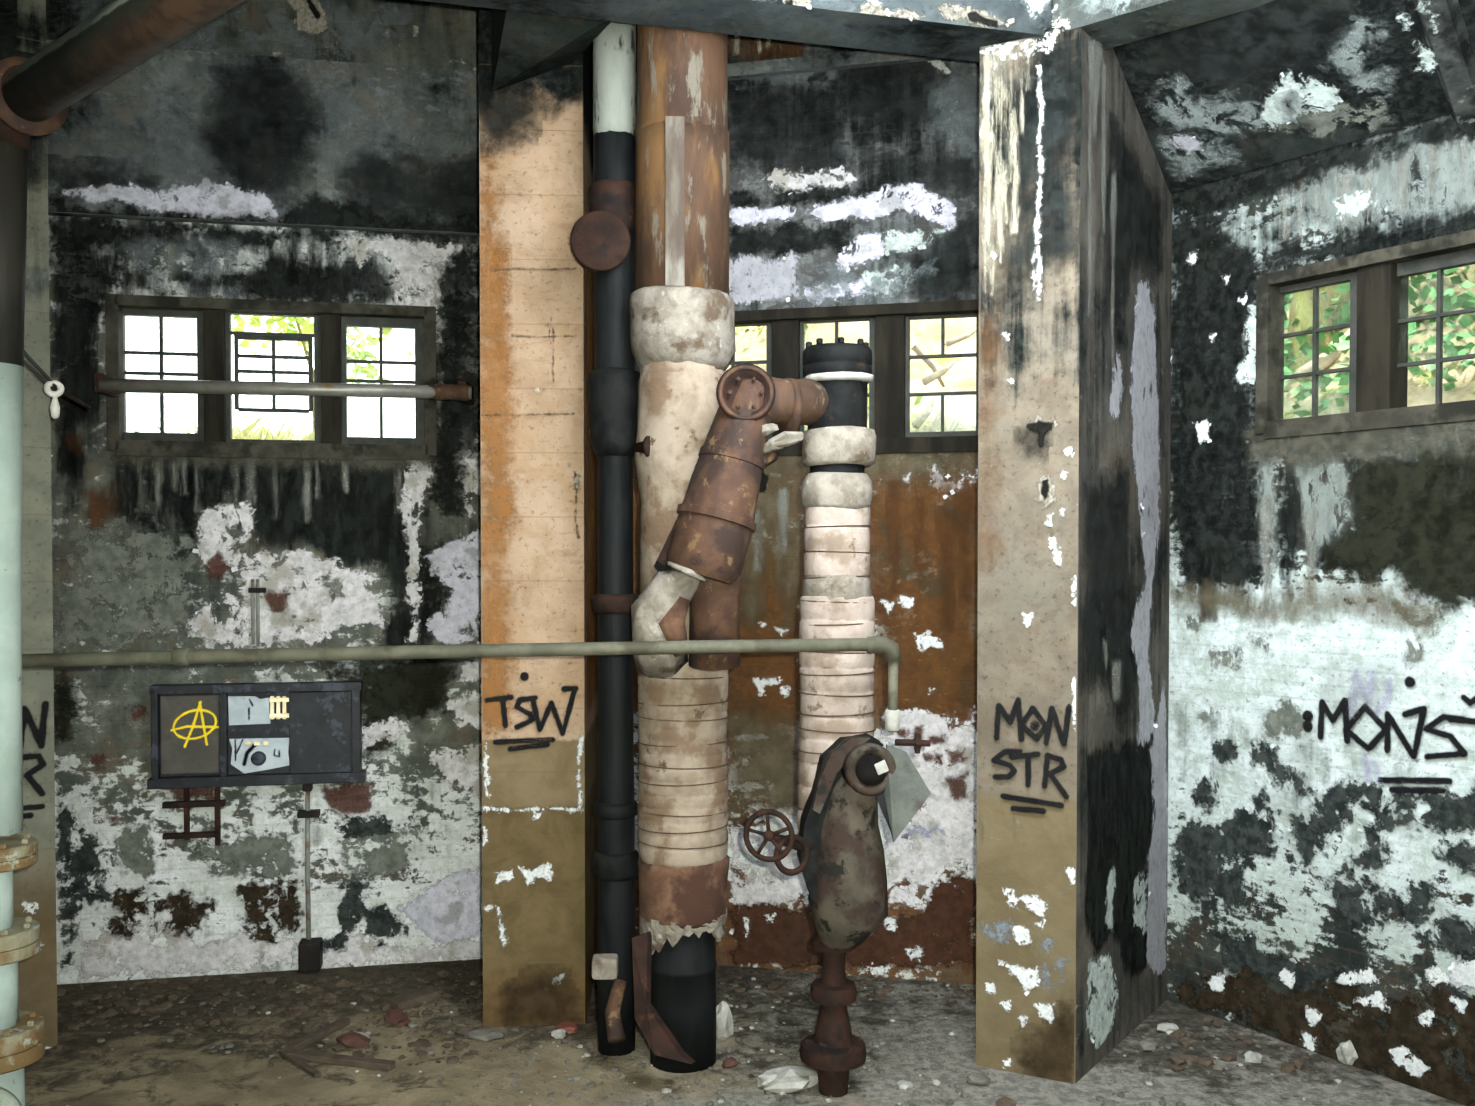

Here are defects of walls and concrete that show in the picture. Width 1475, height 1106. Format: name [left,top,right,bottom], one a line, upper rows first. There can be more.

peeling [729,165,957,305]
damp [979,0,1071,301]
damp [1088,41,1116,249]
damp [1281,138,1475,235]
peeling [185,501,386,649]
peeling [397,435,584,846]
corrosion [727,538,801,761]
corrosion [870,475,978,716]
peeling [1105,278,1475,1106]
damp [1180,457,1431,627]
peeling [55,802,305,983]
damp [1019,1007,1075,1082]